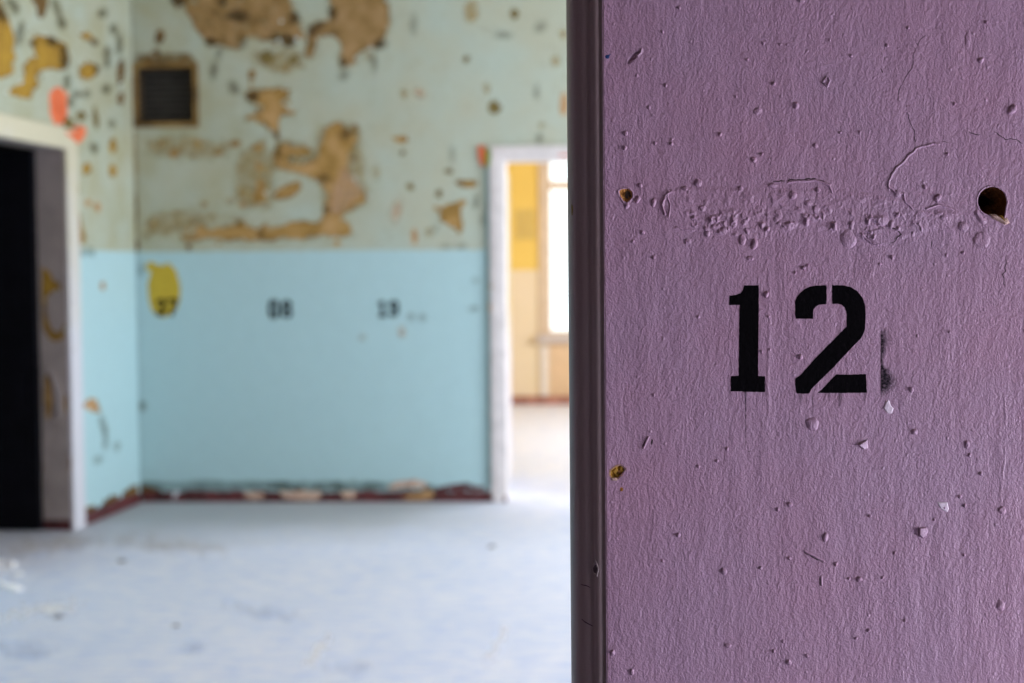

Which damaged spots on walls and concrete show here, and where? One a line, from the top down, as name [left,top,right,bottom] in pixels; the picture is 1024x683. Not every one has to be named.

peeling [0,0,100,100]
peeling [149,0,390,251]